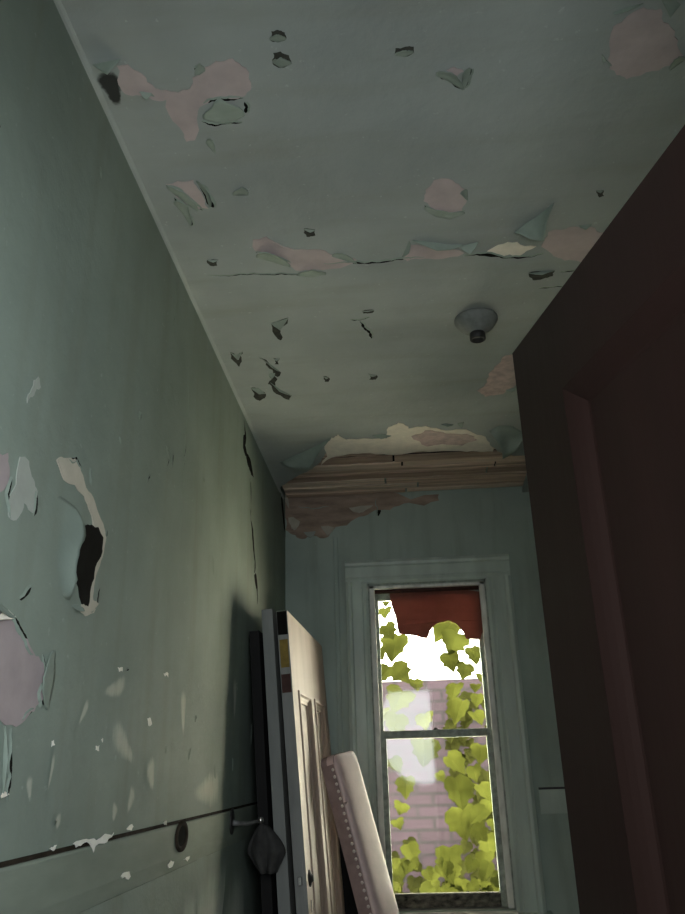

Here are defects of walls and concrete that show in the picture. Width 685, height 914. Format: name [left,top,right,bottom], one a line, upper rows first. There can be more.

peeling [92,58,251,154]
peeling [166,180,217,226]
flaking render [424,178,468,219]
crack [208,203,603,277]
peeling [529,269,575,289]
spalling [271,318,288,340]
spalling [350,310,374,338]
spalling [251,357,292,401]
flaking render [478,354,517,397]
peeling [0,453,38,521]
flaking render [285,493,439,539]
peeling [0,603,56,801]